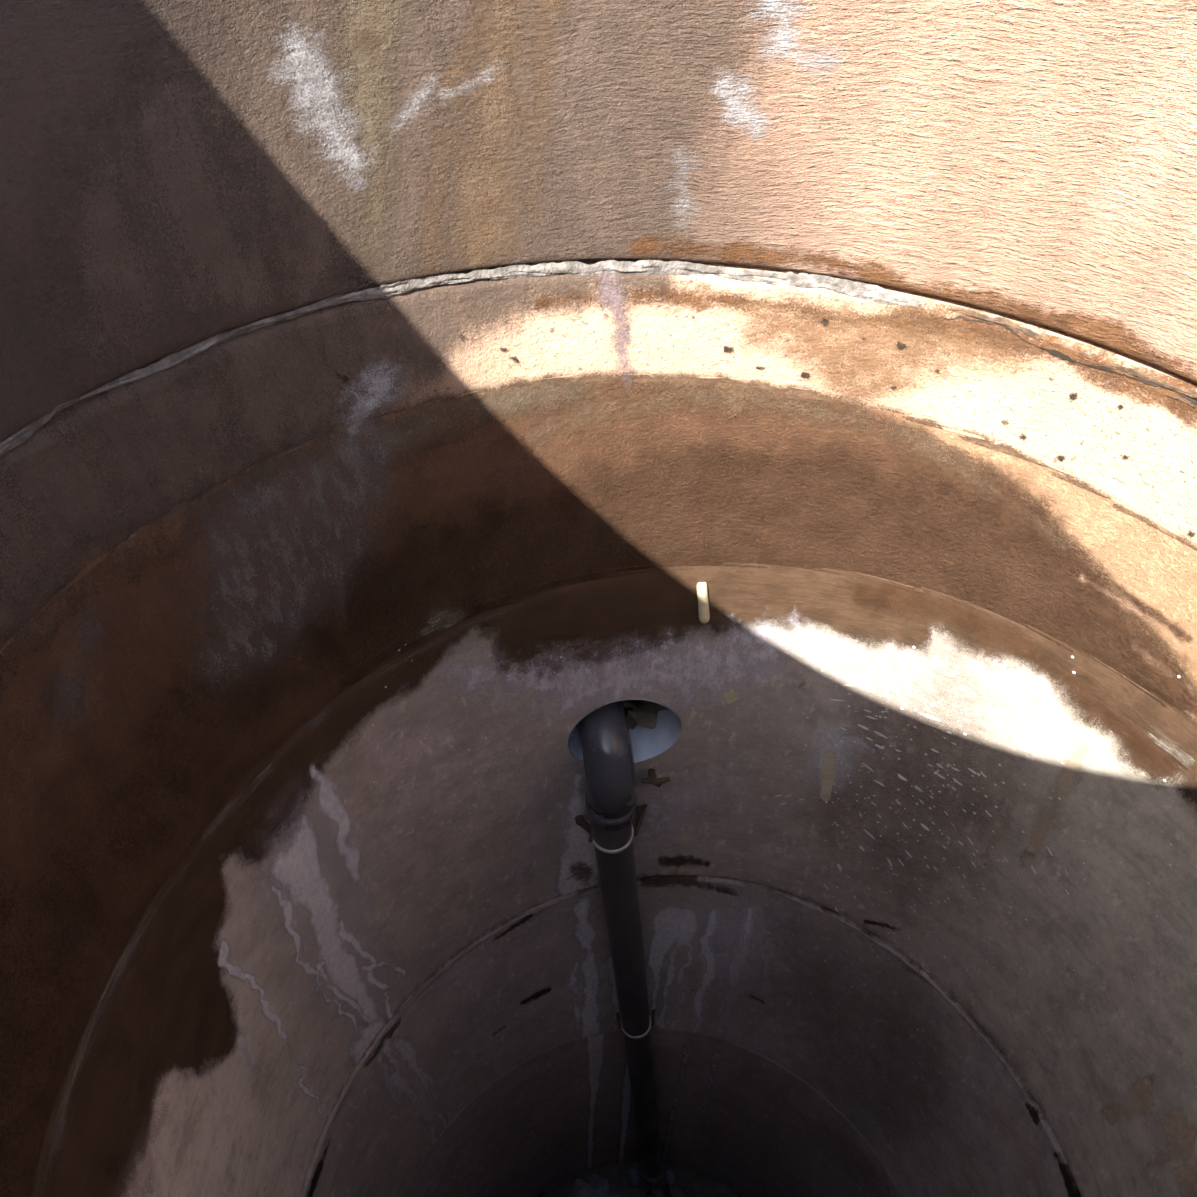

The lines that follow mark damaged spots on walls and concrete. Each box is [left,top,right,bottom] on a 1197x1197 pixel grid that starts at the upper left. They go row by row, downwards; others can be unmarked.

damp [43,0,839,398]
damp [0,272,1197,1197]